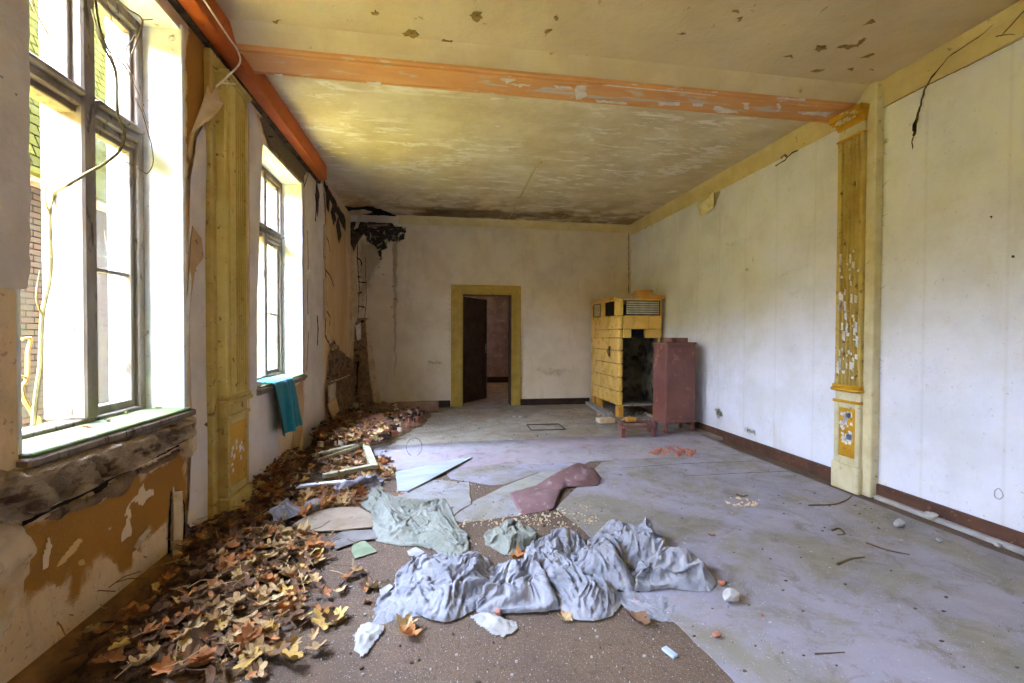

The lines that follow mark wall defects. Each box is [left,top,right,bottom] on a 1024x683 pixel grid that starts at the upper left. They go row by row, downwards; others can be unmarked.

peeling [814,38,875,71]
crack [883,11,1024,149]
flaking render [316,180,386,242]
flaking render [326,295,381,423]
peeling [836,250,859,379]
flaking render [0,416,197,639]
damp [16,448,189,606]